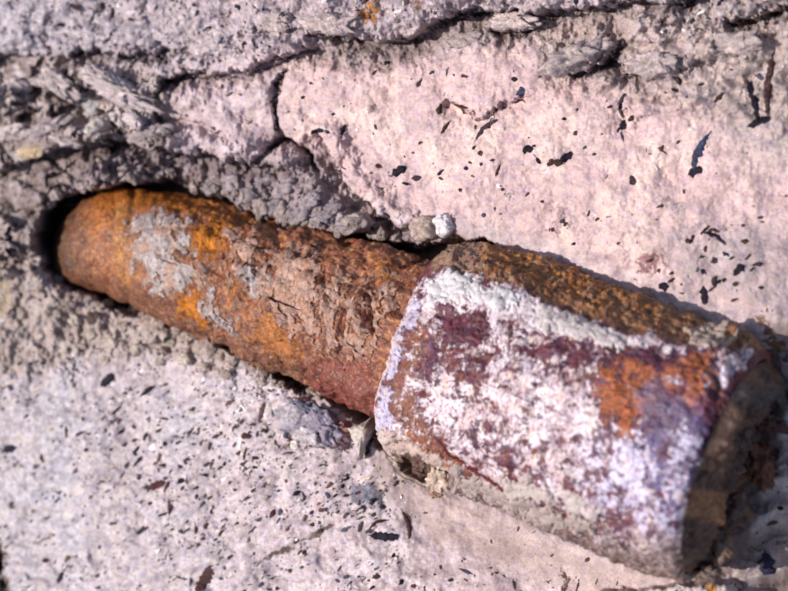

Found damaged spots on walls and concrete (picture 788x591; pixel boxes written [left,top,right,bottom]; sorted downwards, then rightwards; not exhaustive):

crack [304,34,368,43]
crack [388,3,624,47]
crack [568,47,633,79]
crack [72,50,405,232]
crack [446,99,526,121]
corrosion [126,186,251,262]
spalling [25,165,404,389]
corrosion [174,285,215,338]
corrosion [251,305,303,370]
corrosion [755,315,788,357]
peeling [280,261,753,567]
corrosion [594,356,653,439]